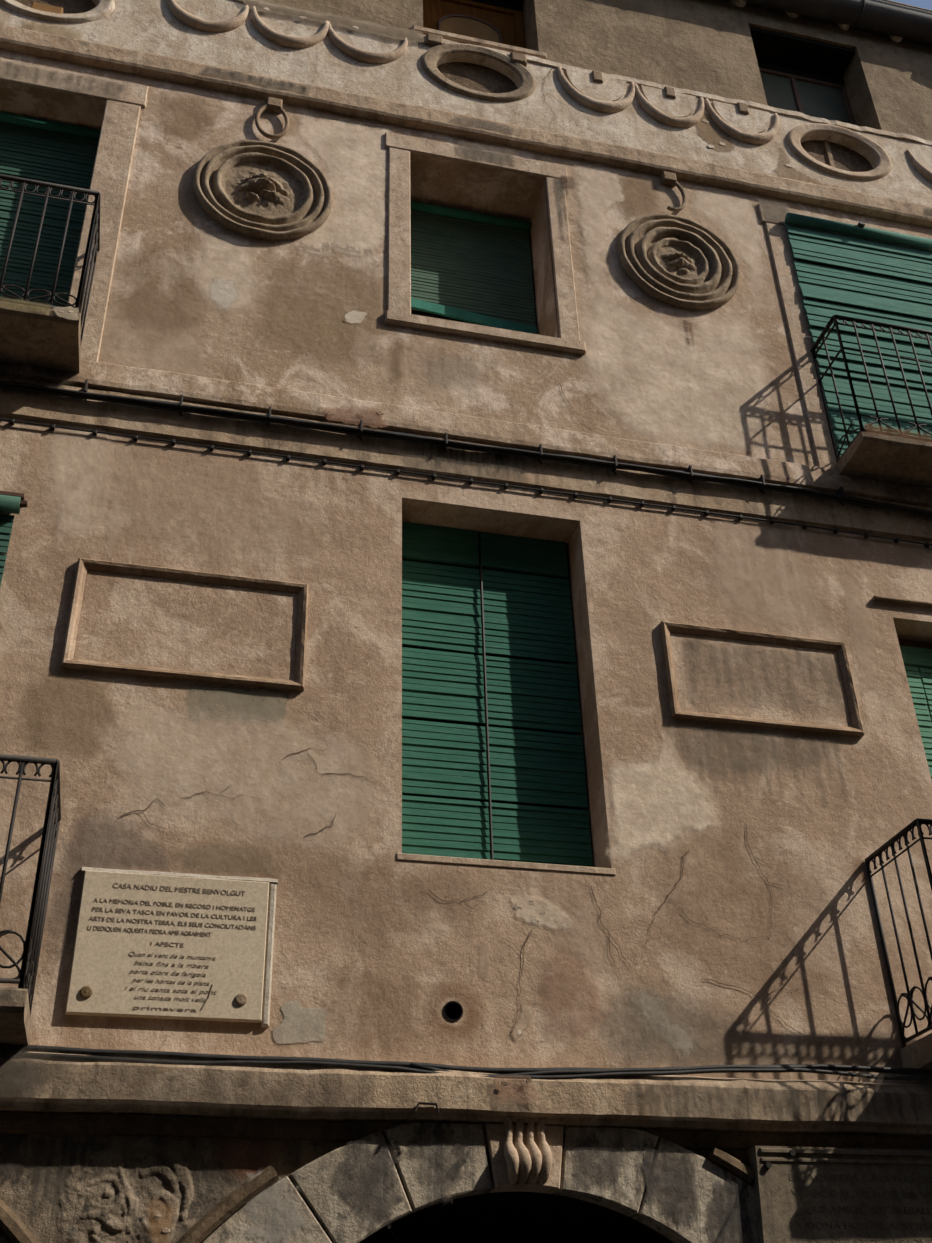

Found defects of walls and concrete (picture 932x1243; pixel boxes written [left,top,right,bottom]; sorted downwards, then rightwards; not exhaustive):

peeling [200,234,256,309]
flaking render [343,310,367,324]
crack [283,748,379,783]
crack [119,784,267,830]
flaking render [510,897,572,929]
crack [592,824,808,982]
crack [502,929,532,1039]